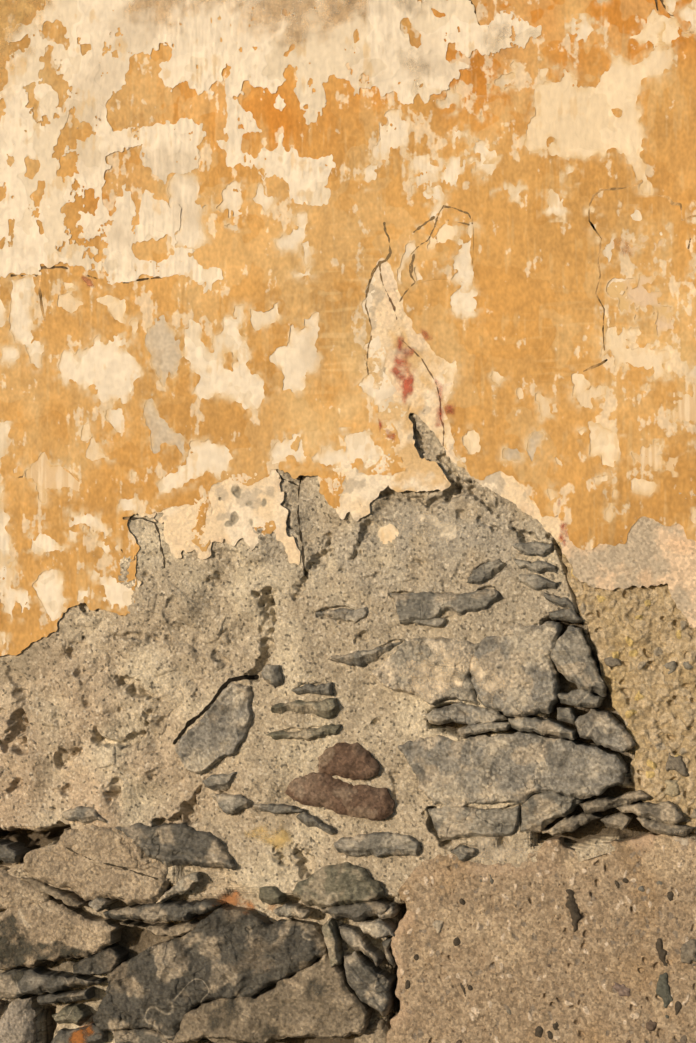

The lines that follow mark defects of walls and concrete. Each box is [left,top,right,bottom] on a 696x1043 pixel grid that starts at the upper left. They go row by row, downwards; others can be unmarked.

peeling [524,0,696,195]
peeling [0,0,542,433]
crack [365,205,473,449]
peeling [545,189,567,222]
crack [583,183,696,372]
spalling [0,222,696,836]
spalling [451,845,476,861]